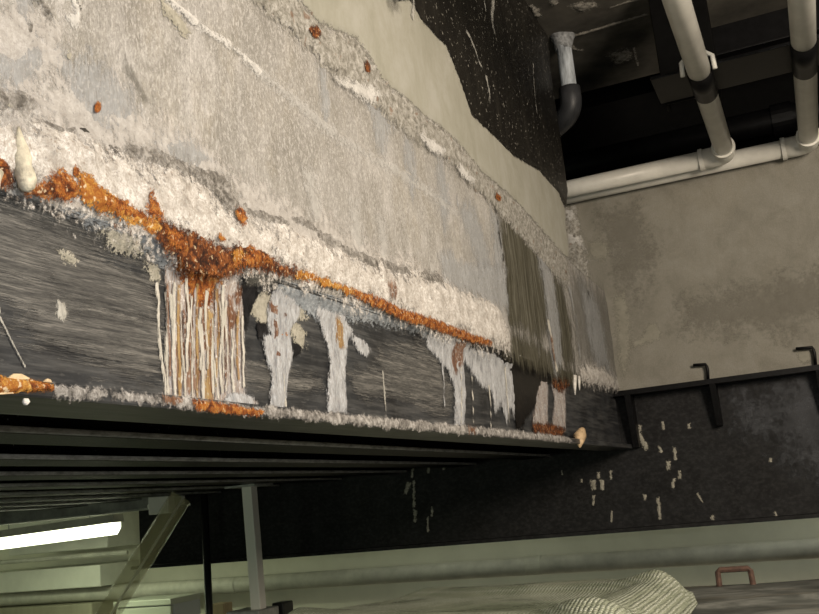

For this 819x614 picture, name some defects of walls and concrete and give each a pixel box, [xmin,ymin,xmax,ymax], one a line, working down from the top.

spalling [0,88,90,133]
peeling [0,193,167,391]
rust [0,158,493,404]
peeling [241,276,272,339]
peeling [244,356,272,392]
spalling [107,144,445,288]
peeling [286,307,324,397]
water stain [0,0,620,448]